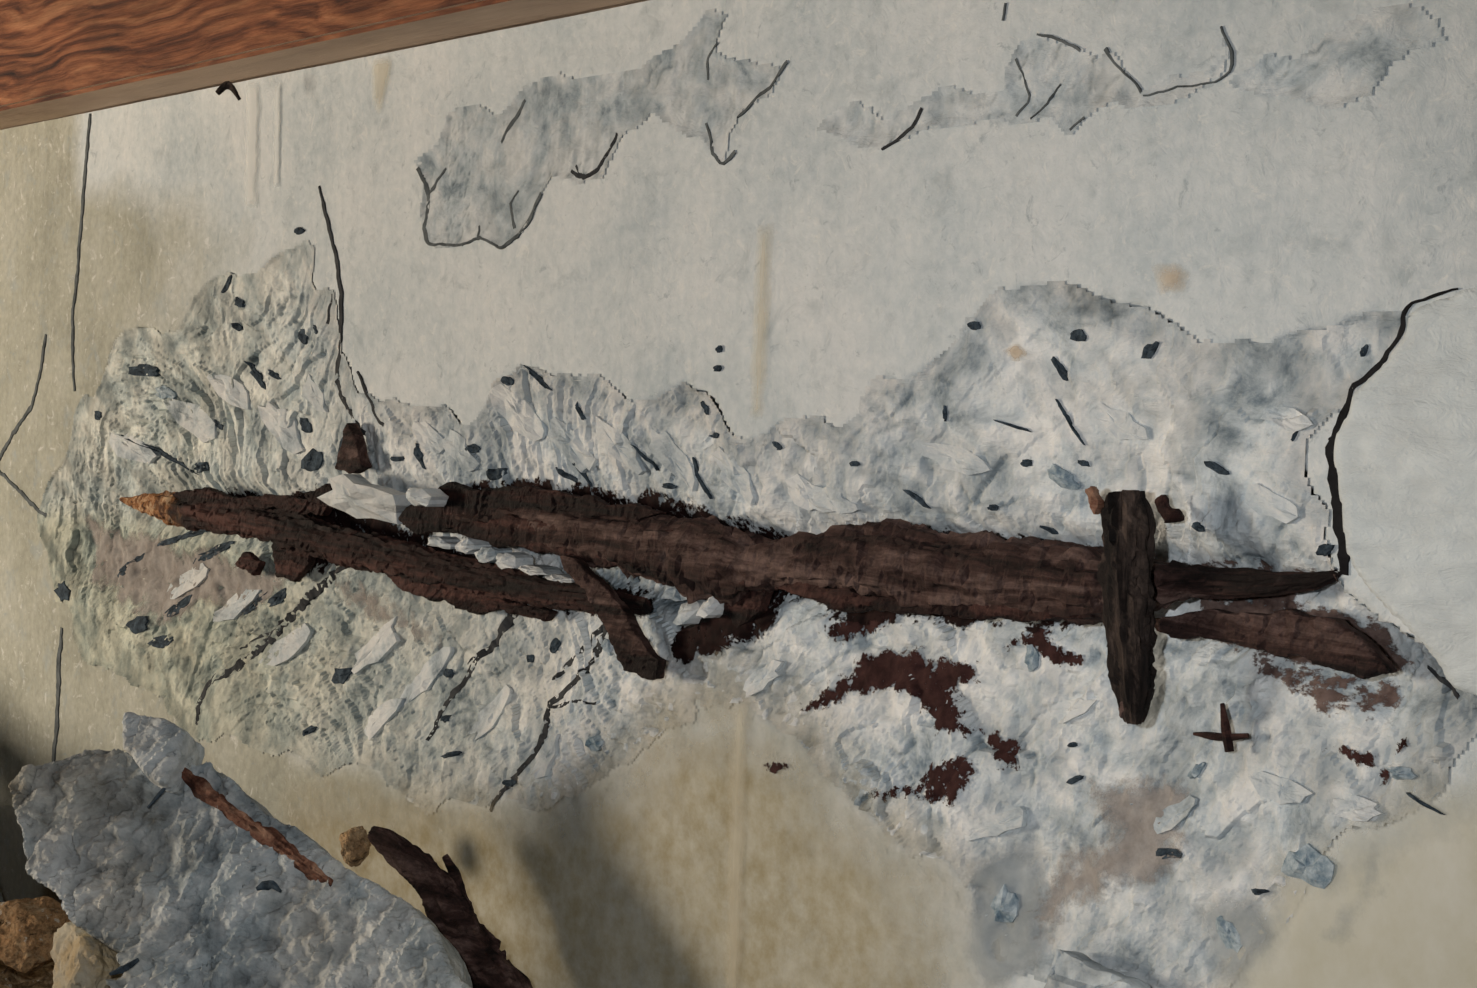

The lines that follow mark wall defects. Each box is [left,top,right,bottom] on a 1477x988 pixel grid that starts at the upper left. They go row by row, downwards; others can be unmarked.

peeling [414,9,780,248]
crack [0,114,91,518]
crack [318,186,384,436]
corrosion [220,483,496,566]
crack [489,624,607,812]
corrosion [472,476,788,540]
spalling [37,227,1477,988]
corrosion [666,589,1103,807]
corrosion [1199,593,1414,719]
damp [305,733,935,988]
damp [972,855,1040,981]
damp [1206,801,1477,988]